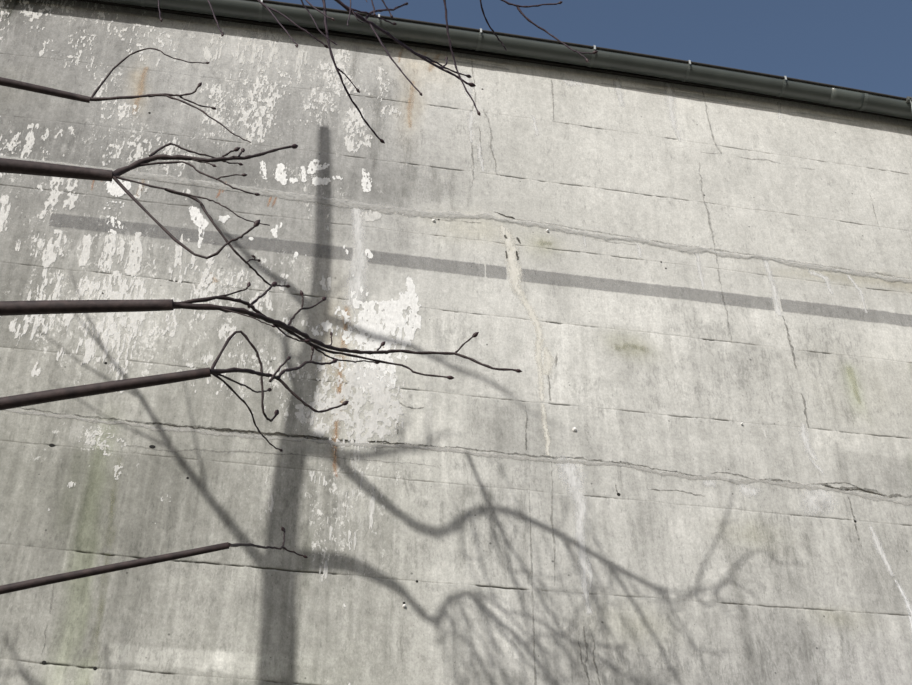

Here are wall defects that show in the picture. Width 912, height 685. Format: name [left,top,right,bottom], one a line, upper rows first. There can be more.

peeling [0,195,11,232]
peeling [0,0,195,67]
peeling [64,30,186,177]
peeling [202,19,401,145]
peeling [260,159,343,186]
peeling [344,108,373,153]
peeling [361,168,372,192]
peeling [9,176,289,380]
peeling [186,324,305,409]
crack [6,407,912,529]
damp [500,225,593,613]
damp [870,526,912,629]